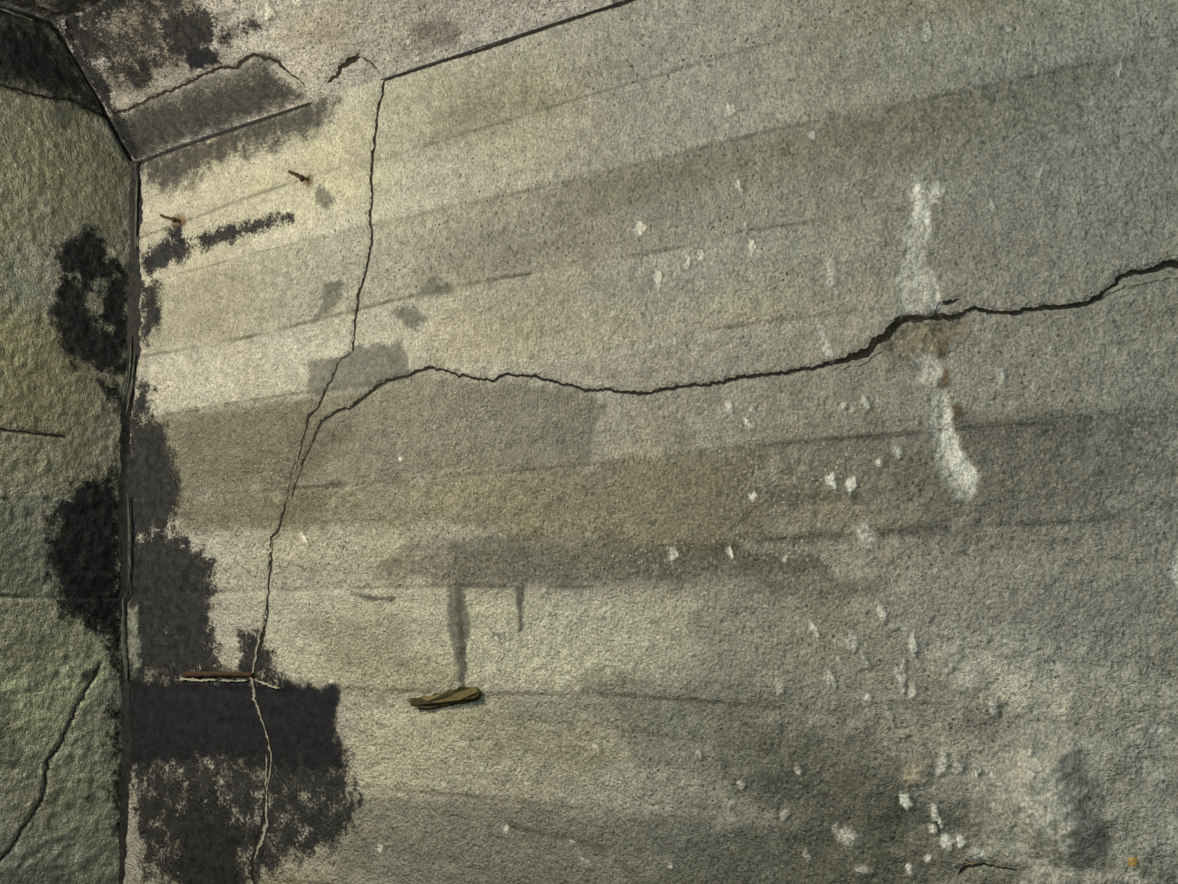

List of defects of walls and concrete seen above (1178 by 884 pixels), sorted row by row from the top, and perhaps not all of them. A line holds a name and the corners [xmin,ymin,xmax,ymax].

damp [0,0,341,195]
crack [0,6,311,884]
damp [40,211,365,884]
damp [447,584,470,686]
damp [515,586,524,631]
crack [250,0,1178,884]